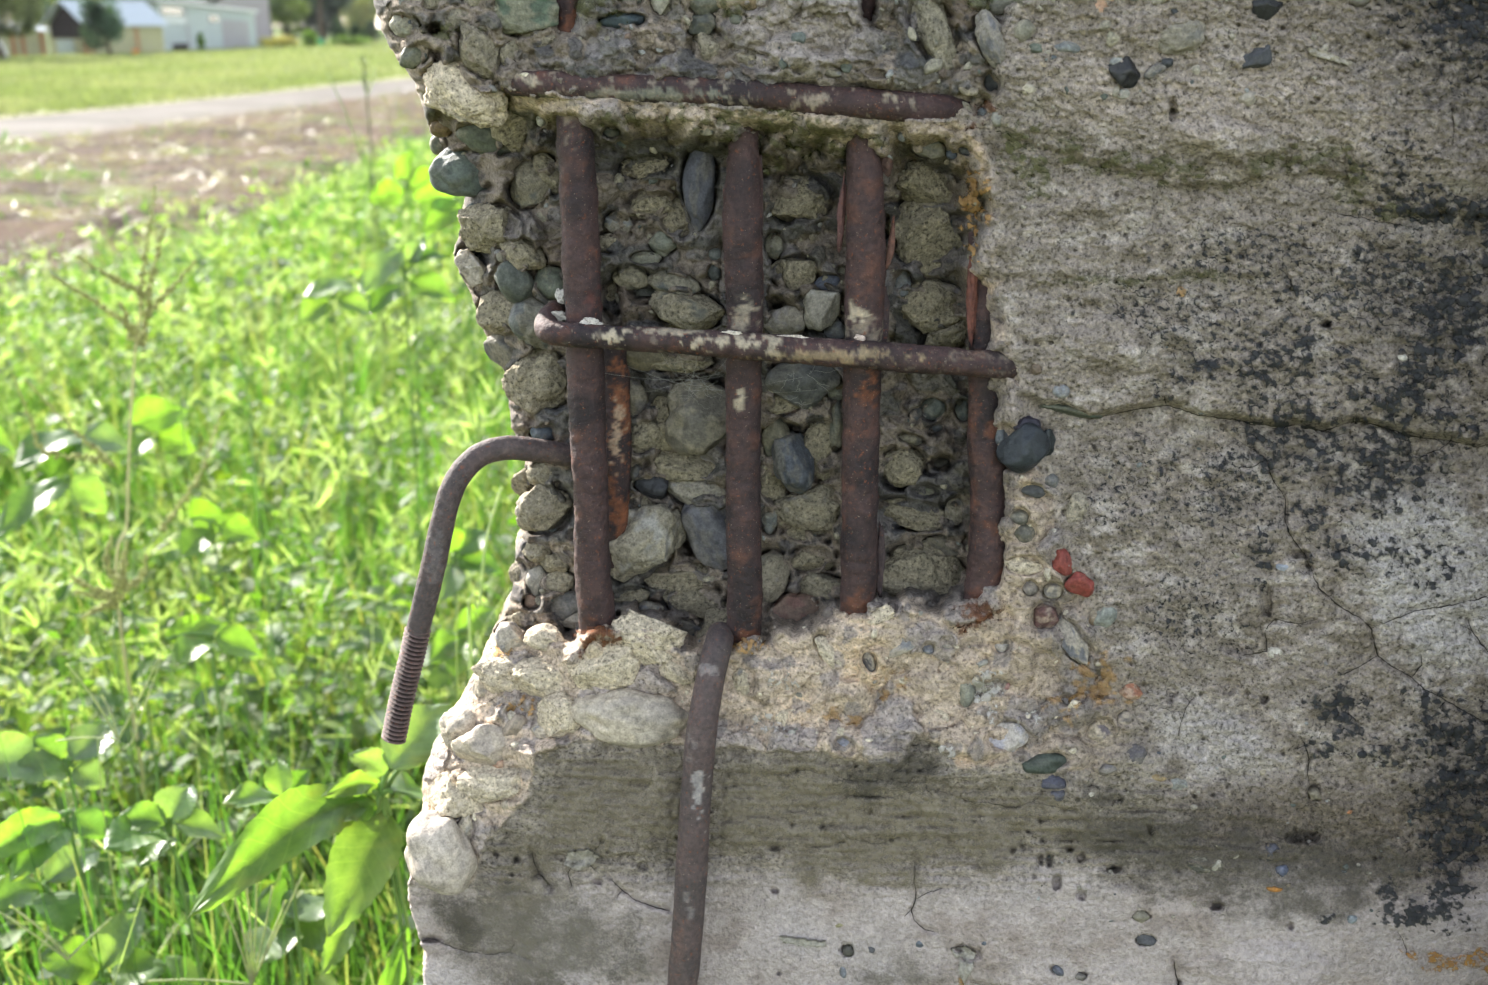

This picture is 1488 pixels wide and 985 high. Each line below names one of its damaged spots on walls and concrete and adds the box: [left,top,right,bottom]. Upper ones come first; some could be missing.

corrosion [964,100,1000,130]
corrosion [836,173,846,253]
corrosion [886,216,895,270]
corrosion [958,165,992,347]
spalling [373,0,1143,789]
crack [1088,396,1488,725]
spalling [404,351,728,895]
corrosion [571,624,622,683]
corrosion [952,597,1005,635]
corrosion [499,695,537,716]